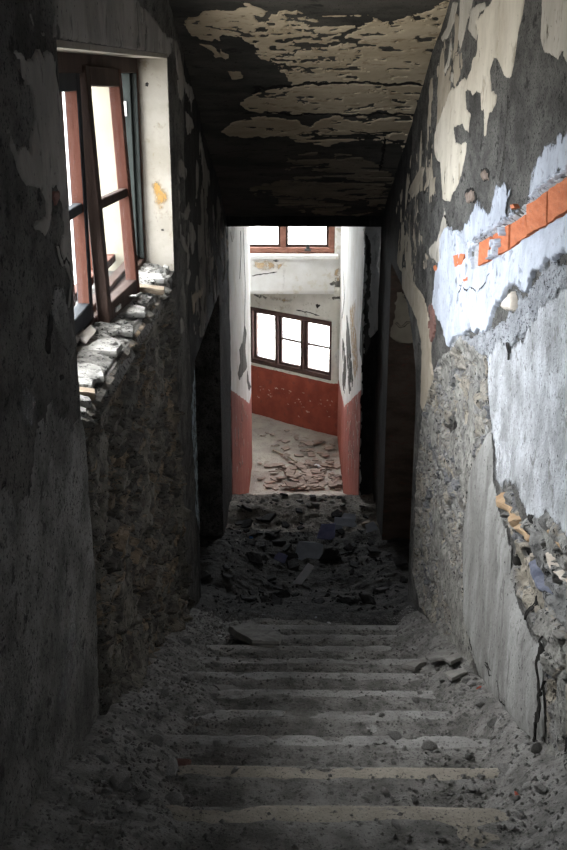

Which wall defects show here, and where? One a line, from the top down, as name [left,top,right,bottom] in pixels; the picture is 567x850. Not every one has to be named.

peeling [6,49,73,280]
spalling [41,0,235,715]
spalling [184,0,567,771]
crack [532,636,547,742]